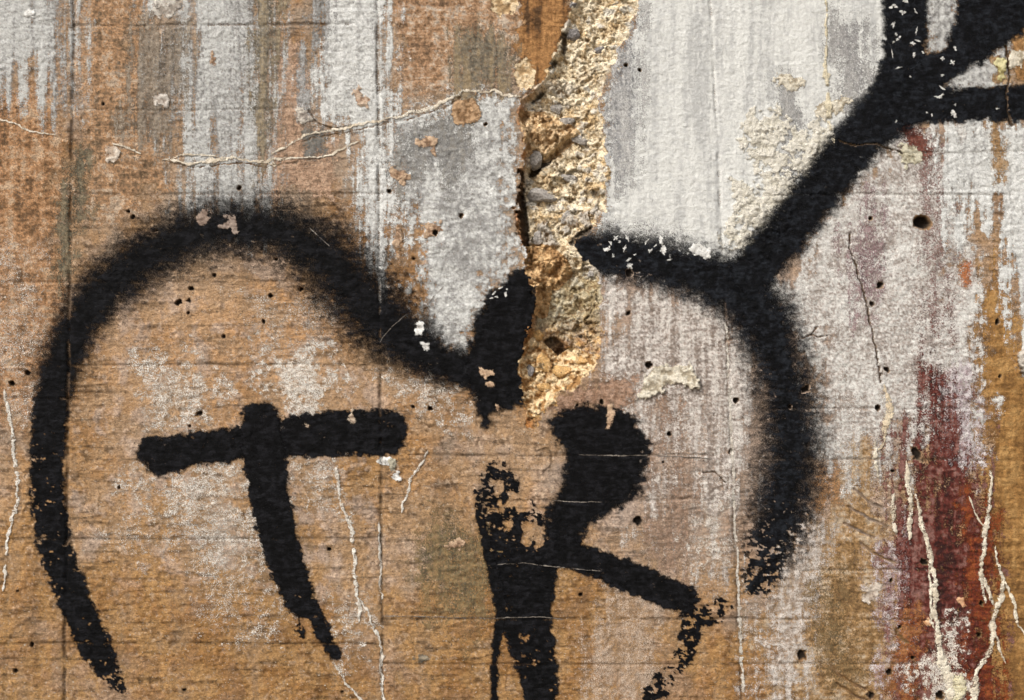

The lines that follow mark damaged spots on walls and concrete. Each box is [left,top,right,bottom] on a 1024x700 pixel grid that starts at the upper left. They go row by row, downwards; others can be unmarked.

crack [0,118,55,135]
crack [112,89,522,168]
spalling [511,0,639,429]
crack [848,234,882,383]
rust [737,121,1024,700]